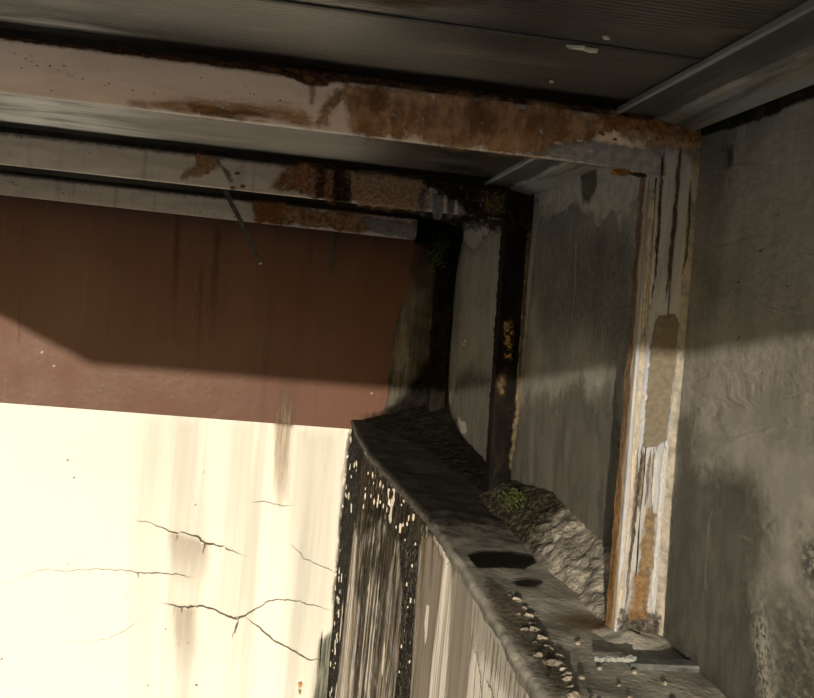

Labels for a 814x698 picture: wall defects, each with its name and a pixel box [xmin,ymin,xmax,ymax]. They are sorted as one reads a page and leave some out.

rust [0,36,702,163]
rust [181,153,246,190]
rust [253,161,429,240]
leakage [276,399,292,478]
leakage [380,178,620,548]
rust [560,168,657,630]
crack [19,567,188,580]
crack [137,520,241,555]
leakage [617,432,814,698]
crack [169,599,320,661]